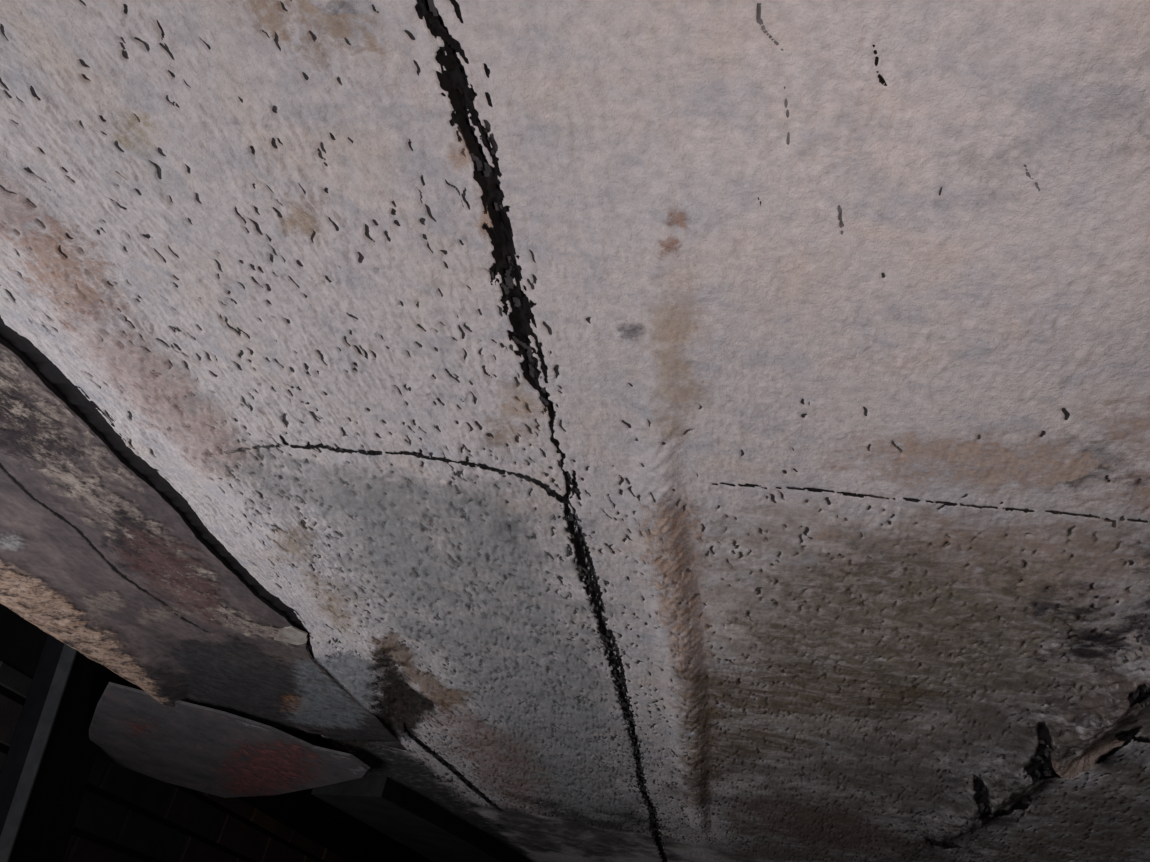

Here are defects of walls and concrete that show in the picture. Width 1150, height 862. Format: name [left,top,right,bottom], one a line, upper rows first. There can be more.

crack [756,3,783,51]
crack [872,45,887,86]
crack [783,86,791,145]
crack [836,205,844,235]
crack [206,0,669,862]
crack [712,482,1150,528]
damp [148,473,681,861]
damp [670,509,1150,862]
spalling [911,616,1150,849]